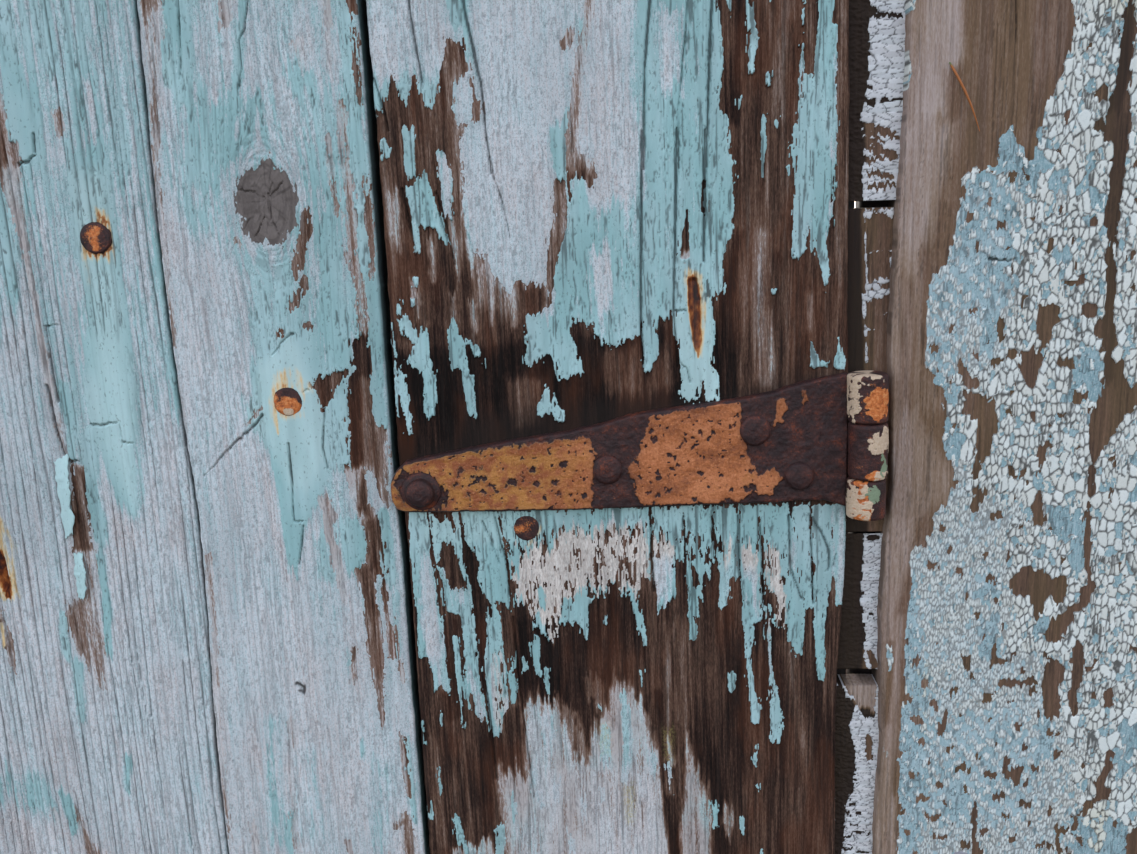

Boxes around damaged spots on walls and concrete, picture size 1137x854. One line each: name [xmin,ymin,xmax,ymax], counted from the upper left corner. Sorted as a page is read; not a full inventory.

corrosion [79,205,117,282]
peeling [289,206,314,314]
corrosion [683,264,710,359]
corrosion [268,362,315,436]
peeling [313,0,850,854]
peeling [871,0,1137,854]
corrosion [0,513,22,603]